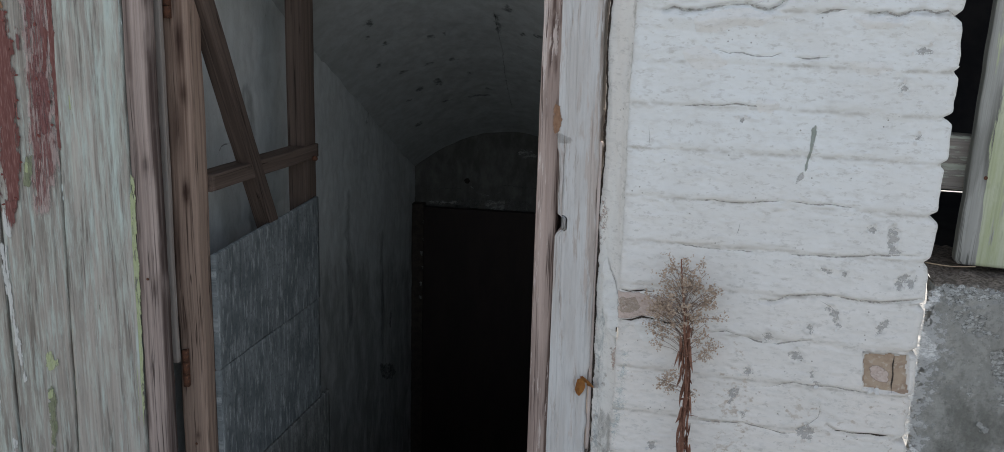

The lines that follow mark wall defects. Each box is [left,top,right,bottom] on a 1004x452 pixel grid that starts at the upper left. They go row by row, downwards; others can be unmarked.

peeling [0,0,71,383]
spalling [617,290,677,318]
spalling [859,352,908,395]